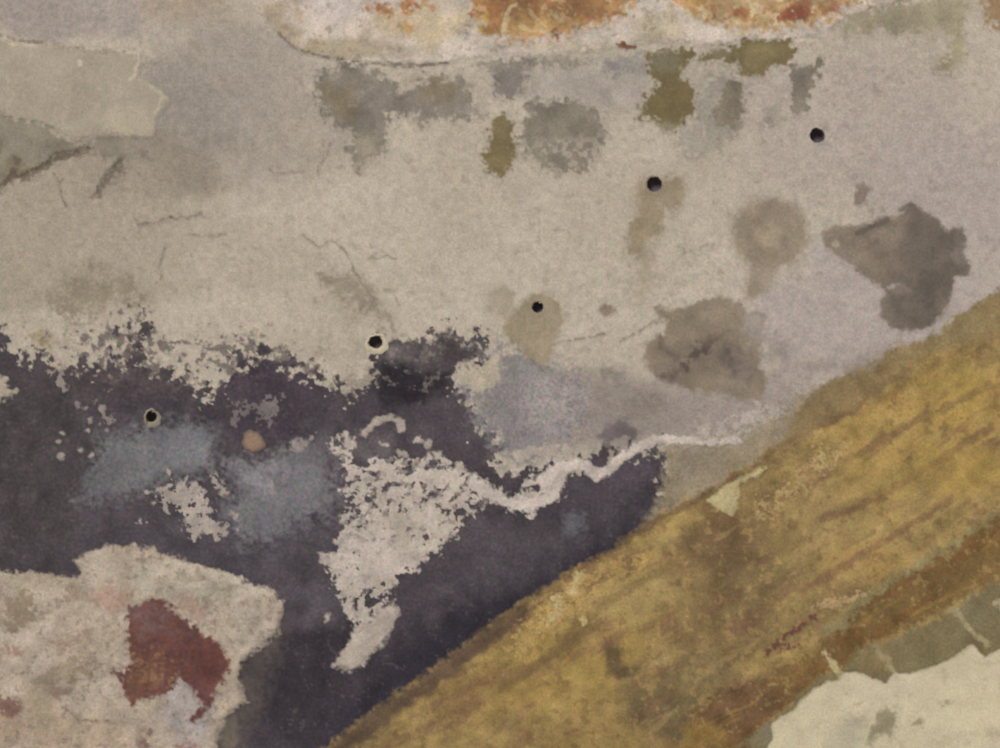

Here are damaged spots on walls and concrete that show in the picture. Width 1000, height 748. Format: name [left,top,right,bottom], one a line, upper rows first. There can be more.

corrosion [363,0,438,38]
corrosion [462,0,640,49]
corrosion [667,0,880,38]
water stain [303,31,974,404]
water stain [594,415,643,450]
peeling [809,588,875,615]
spalling [0,541,287,748]
water stain [0,581,295,748]
spalling [765,606,1000,748]